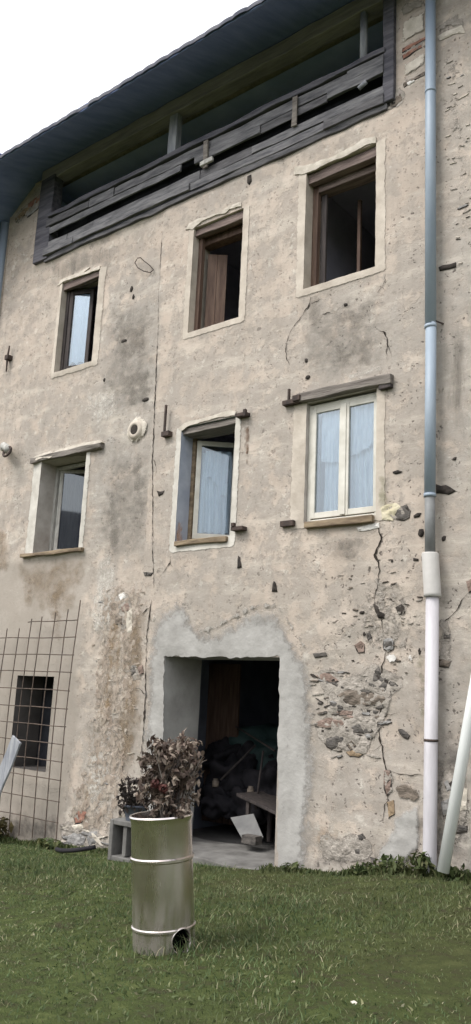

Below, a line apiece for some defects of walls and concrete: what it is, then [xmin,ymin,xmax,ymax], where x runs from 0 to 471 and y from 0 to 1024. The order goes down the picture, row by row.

flaking render [59,572,153,848]
crack [119,335,172,783]
flaking render [308,559,423,759]
crack [373,528,421,821]